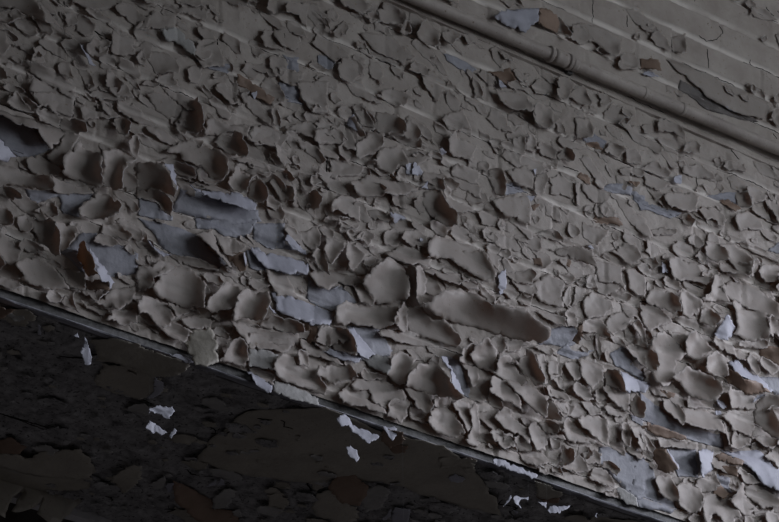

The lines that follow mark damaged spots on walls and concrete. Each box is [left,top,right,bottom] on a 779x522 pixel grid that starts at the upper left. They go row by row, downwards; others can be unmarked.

crack [684,26,735,87]
peeling [259,0,779,522]
peeling [0,449,96,522]
peeling [197,407,529,522]